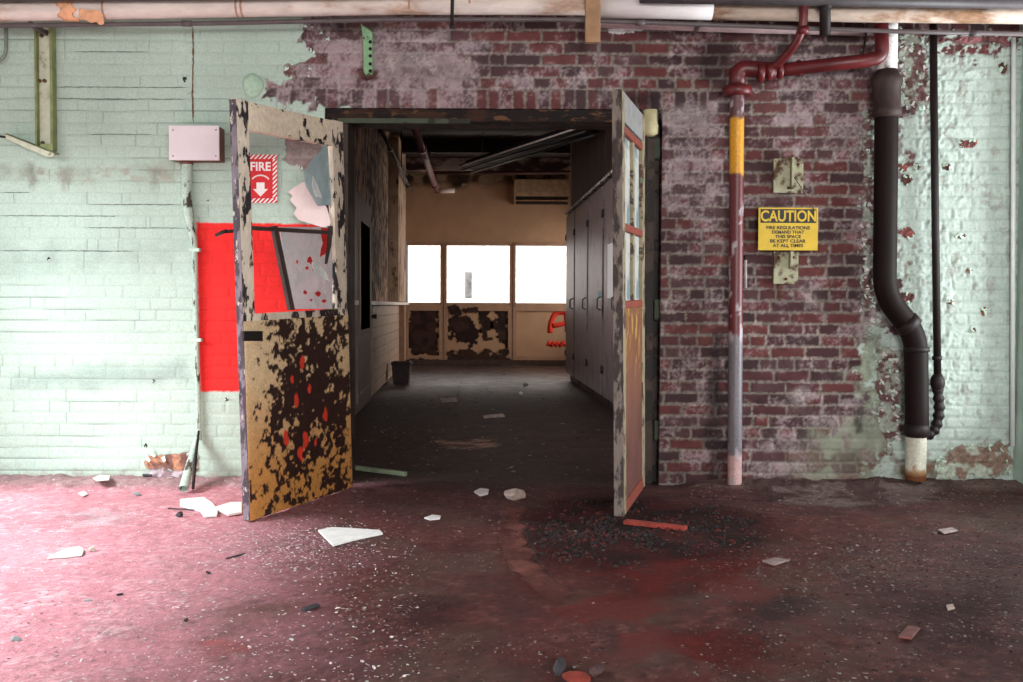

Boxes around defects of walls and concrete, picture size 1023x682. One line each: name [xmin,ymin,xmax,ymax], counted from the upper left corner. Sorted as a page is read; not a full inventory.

peeling [284,24,331,81]
peeling [898,34,1013,115]
peeling [959,139,977,148]
peeling [898,162,921,186]
peeling [899,226,915,240]
peeling [901,292,915,304]
peeling [874,347,905,456]
spalling [144,443,199,478]